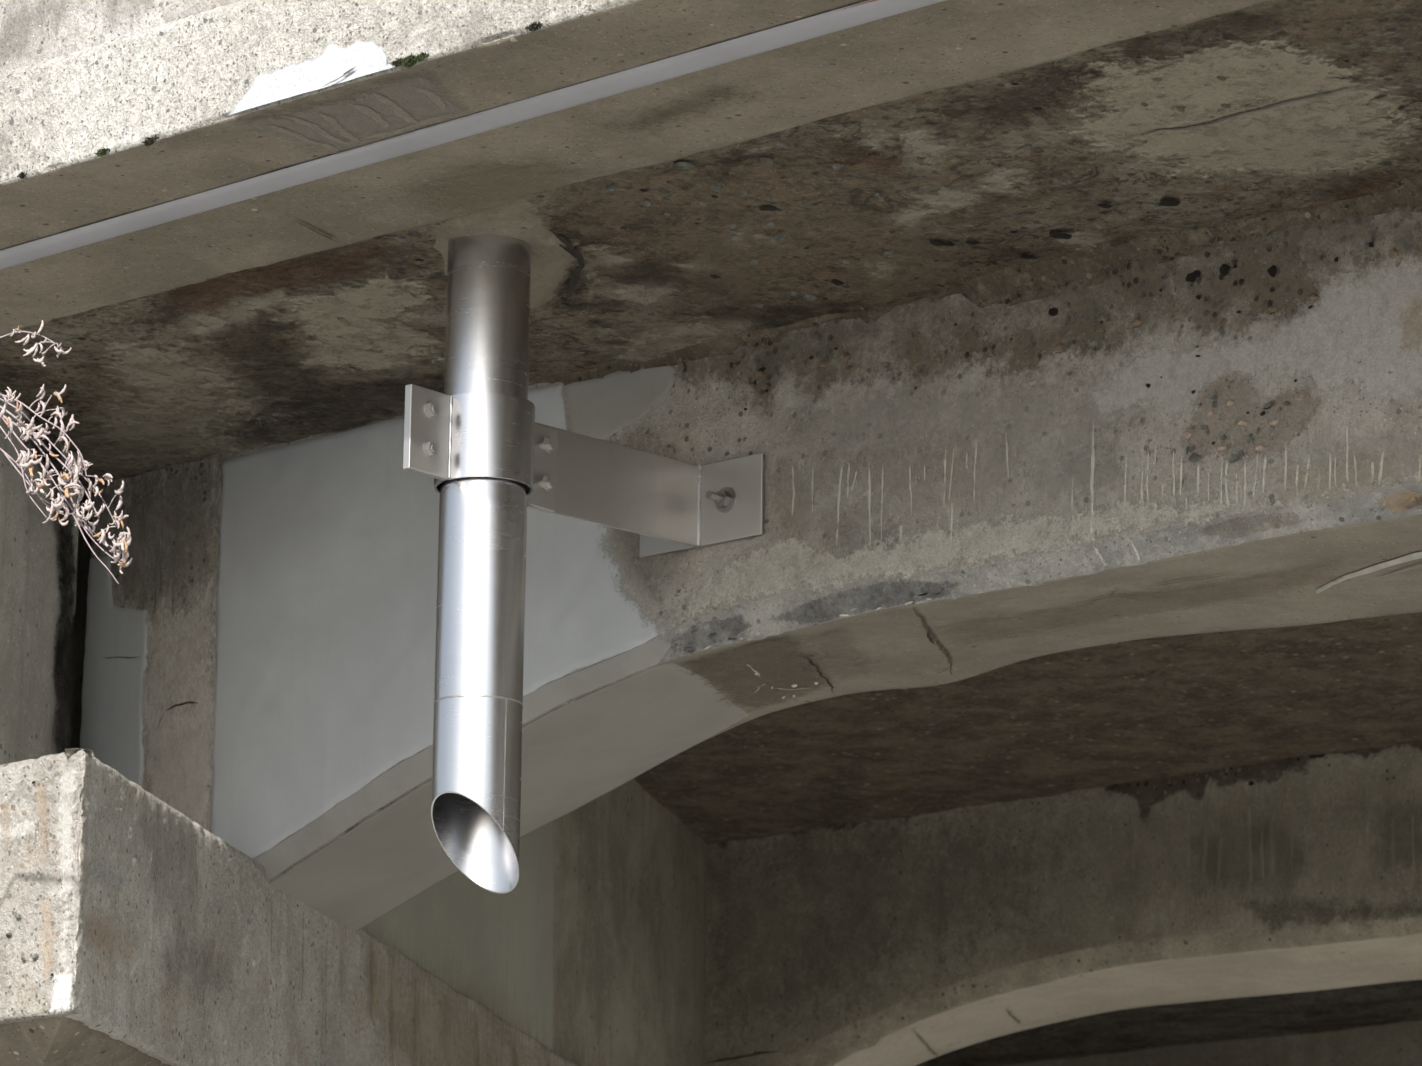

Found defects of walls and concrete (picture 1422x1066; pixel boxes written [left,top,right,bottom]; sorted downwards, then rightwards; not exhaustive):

water stain [968,15,1293,133]
water stain [135,251,444,432]
peeling [613,203,1422,467]
water stain [676,437,1422,623]
spalling [672,615,760,652]
crack [802,655,834,693]
spalling [784,580,959,623]
crack [914,608,953,675]
crack [1315,552,1422,593]